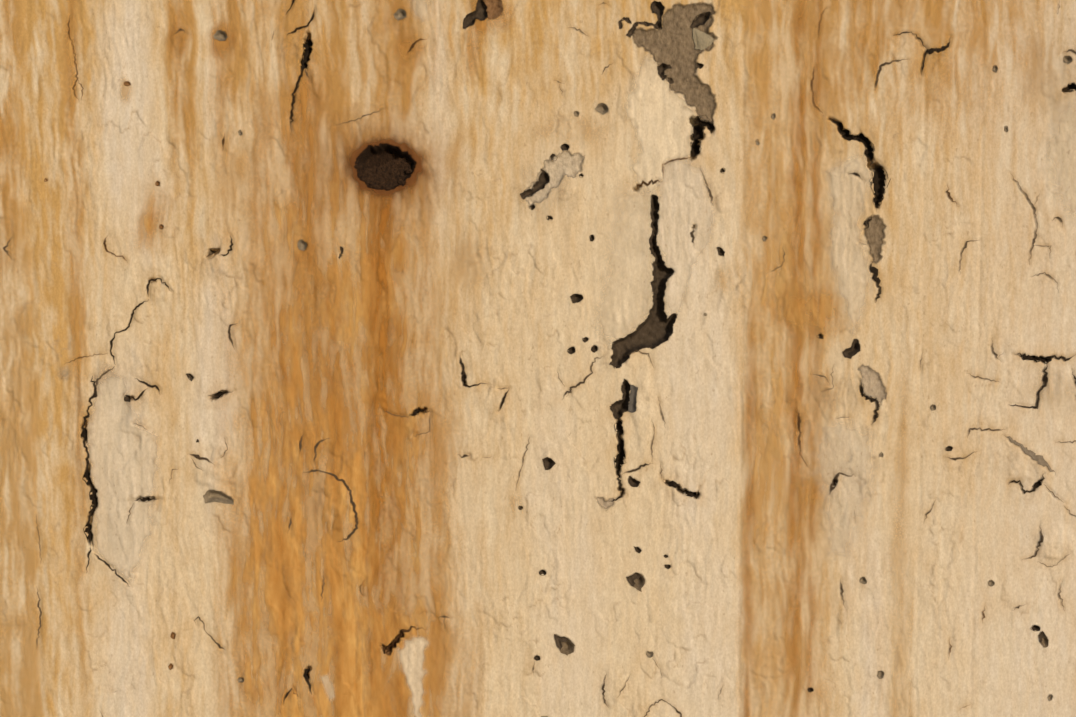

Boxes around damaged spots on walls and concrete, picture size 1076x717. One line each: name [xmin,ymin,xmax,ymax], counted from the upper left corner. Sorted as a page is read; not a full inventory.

crack [73,278,169,584]
crack [287,0,315,127]
rust [233,81,447,717]
rust [475,16,499,32]
spalling [520,151,585,205]
crack [558,115,715,502]
spalling [603,1,716,338]
rust [751,137,806,542]
crack [811,70,891,301]
peeling [832,159,886,321]
spalling [858,365,886,405]
crack [950,342,1076,516]